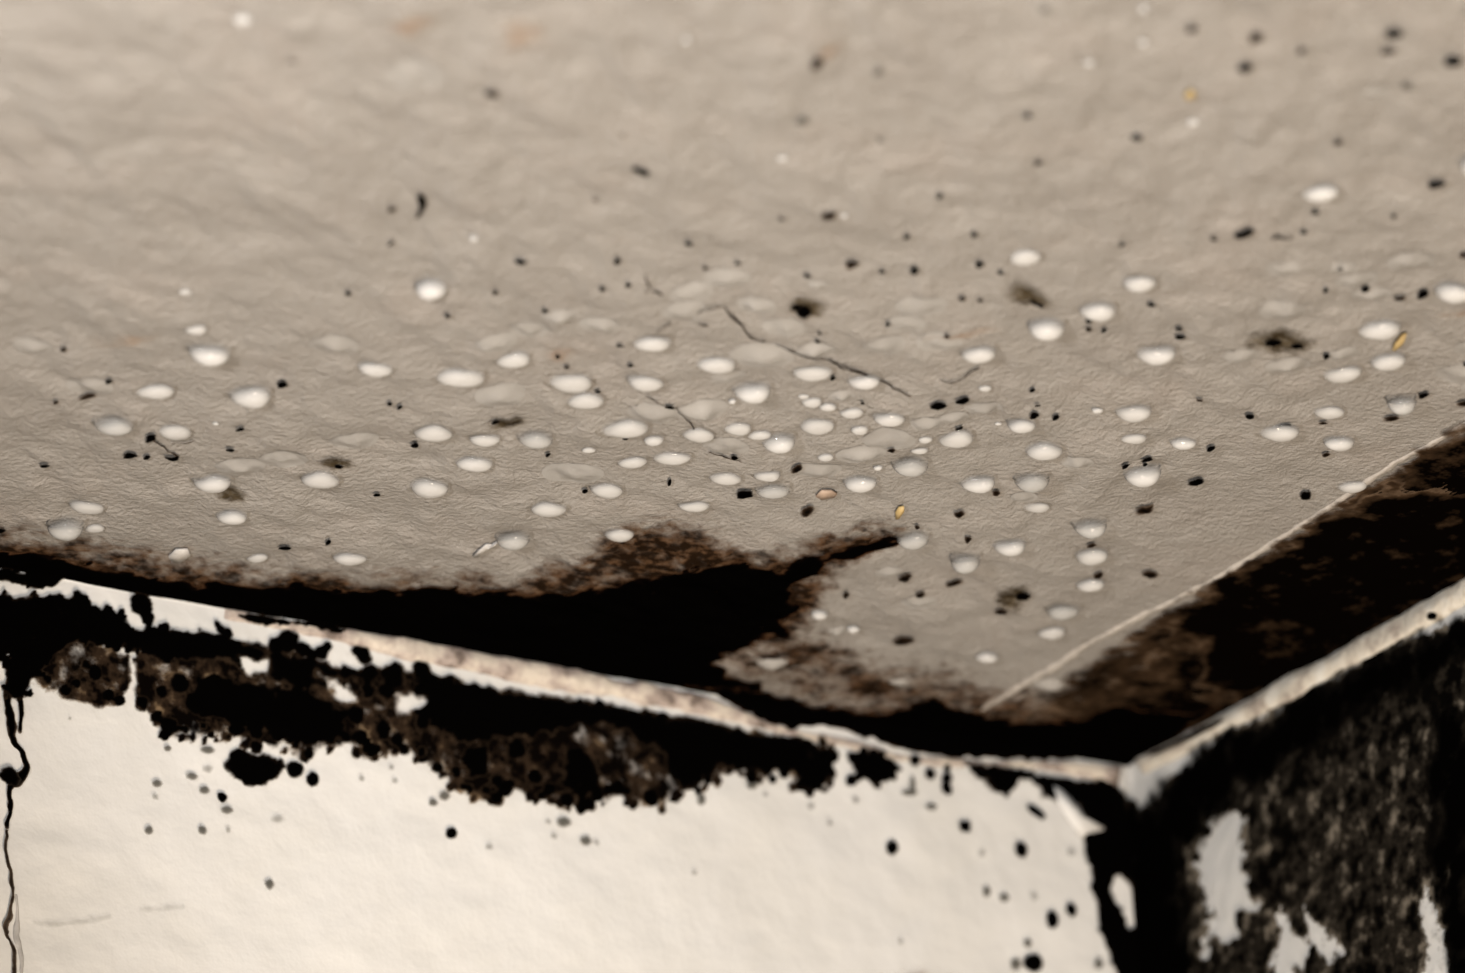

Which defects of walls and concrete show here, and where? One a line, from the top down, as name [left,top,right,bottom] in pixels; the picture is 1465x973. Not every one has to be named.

mould [930,397,970,410]
mould [1029,388,1060,421]
water stain [0,401,1465,973]